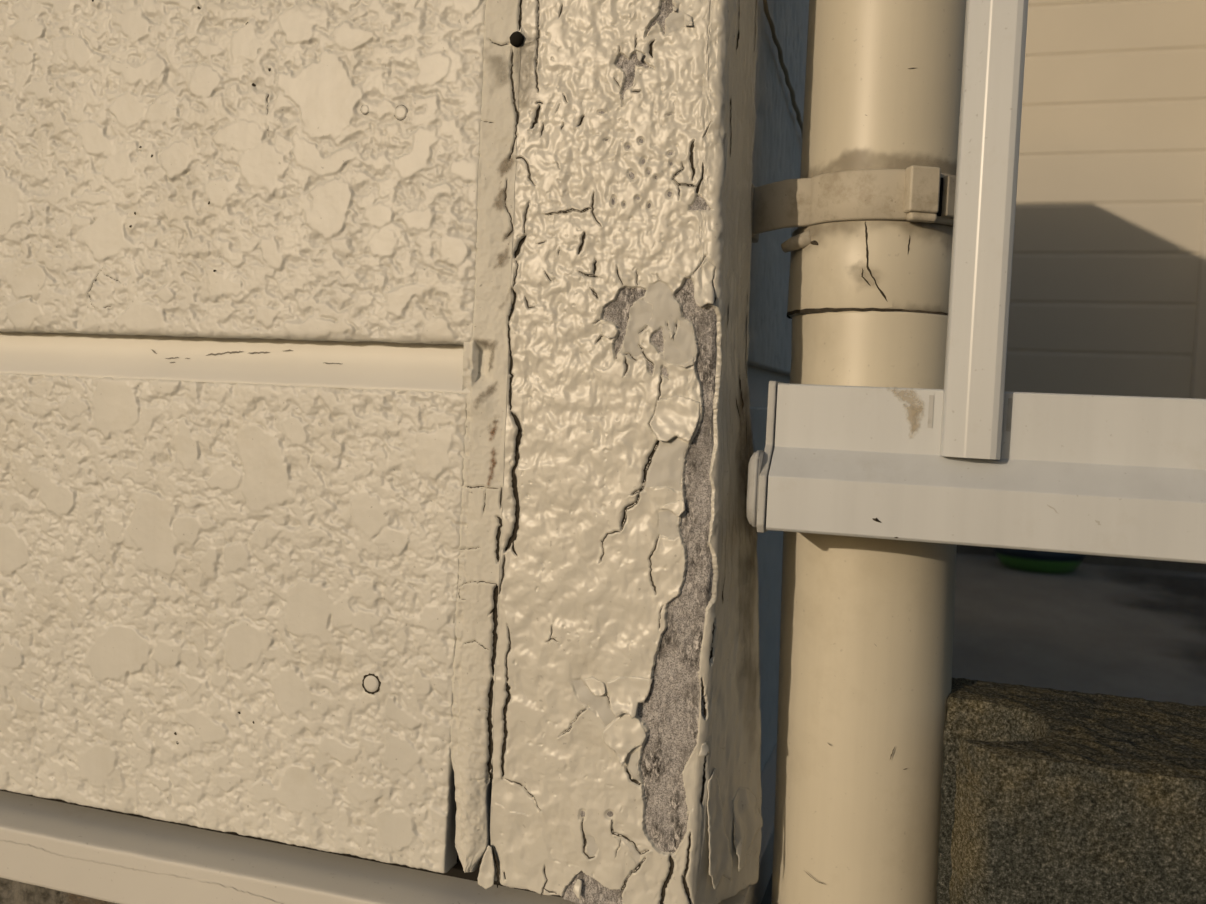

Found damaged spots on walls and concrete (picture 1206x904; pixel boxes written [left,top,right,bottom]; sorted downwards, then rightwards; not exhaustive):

peeling [614,0,693,102]
crack [787,221,948,319]
crack [458,0,602,782]
peeling [541,259,763,904]
crack [492,846,506,888]
crack [660,832,691,904]